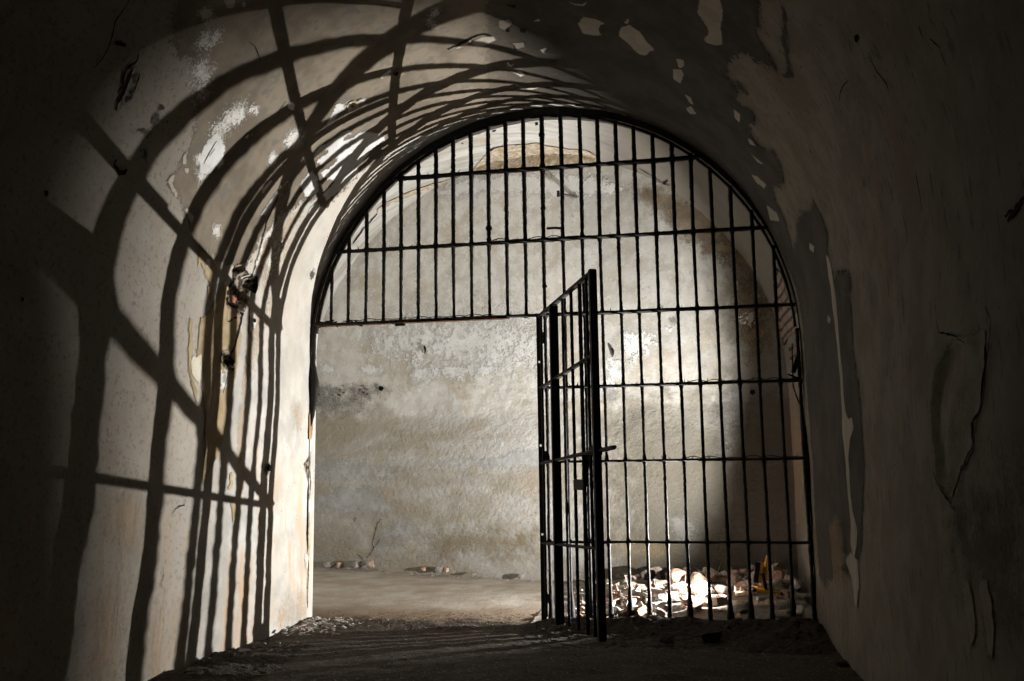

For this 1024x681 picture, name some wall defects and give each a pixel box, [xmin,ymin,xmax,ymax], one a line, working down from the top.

flaking render [166,0,866,588]